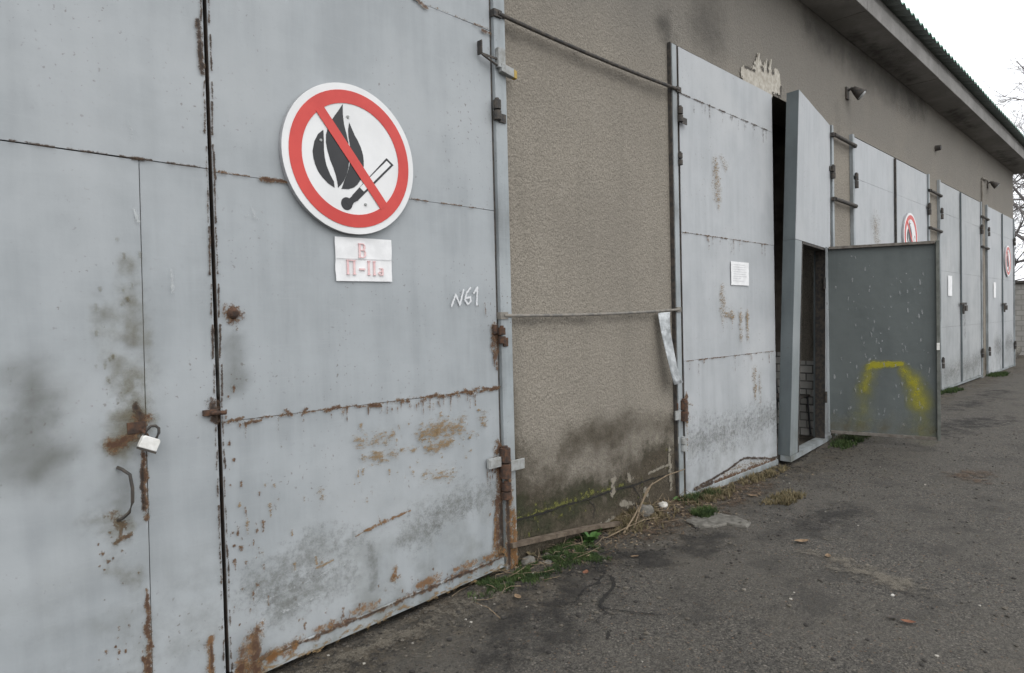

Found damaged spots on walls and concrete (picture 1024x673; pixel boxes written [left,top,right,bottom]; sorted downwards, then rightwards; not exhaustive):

flaking render [741,53,782,98]
rust [167,0,500,596]
rust [686,286,774,363]
rust [104,401,153,521]
rust [206,440,518,673]
water stain [516,447,685,561]
rust [140,588,154,673]